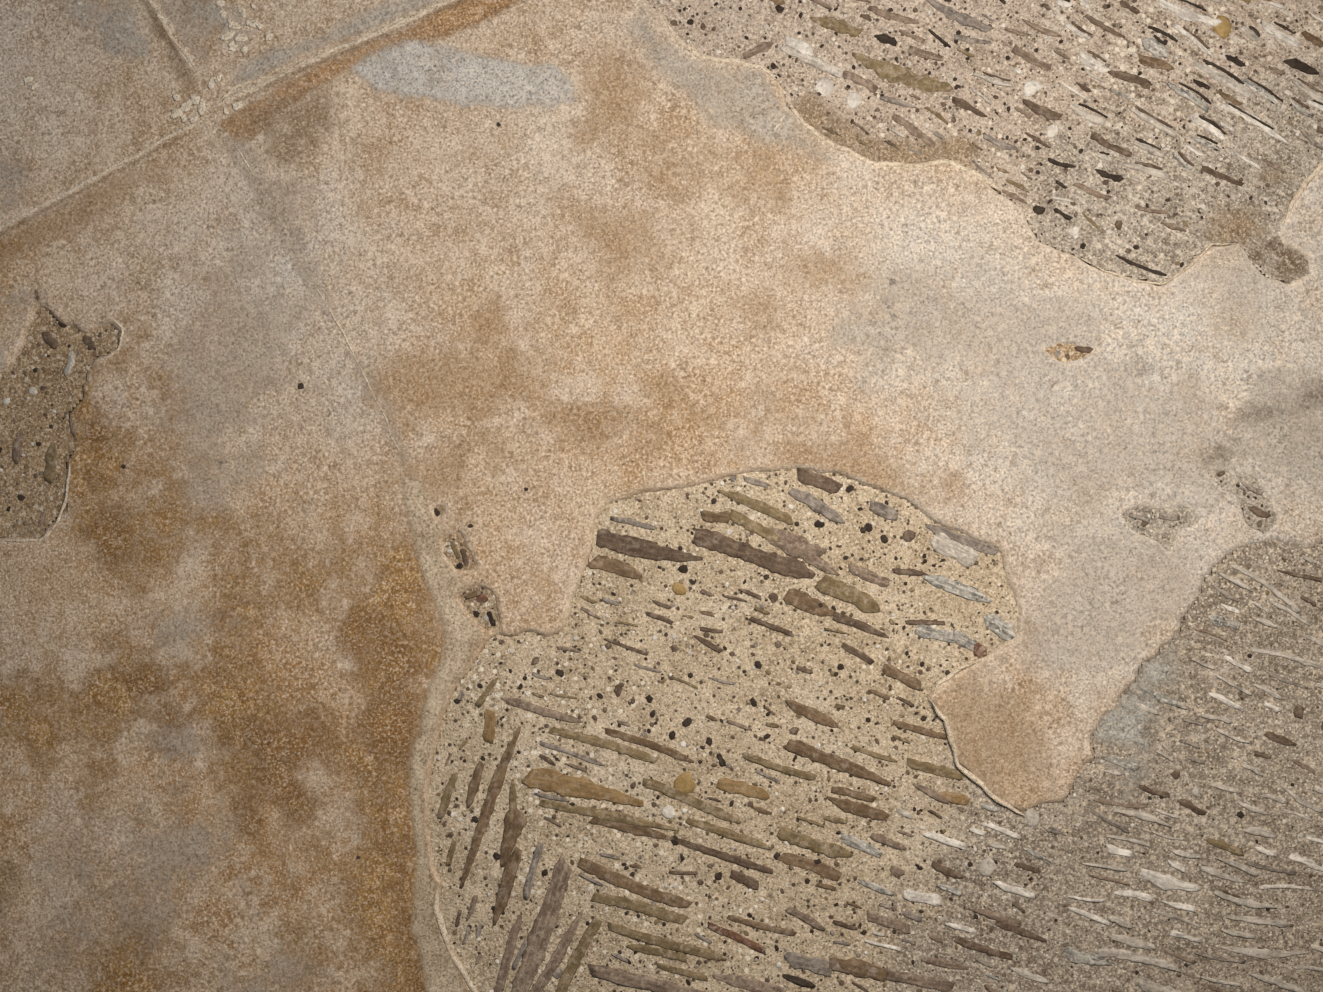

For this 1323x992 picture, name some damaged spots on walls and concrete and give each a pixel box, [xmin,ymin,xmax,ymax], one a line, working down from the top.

flaking render [0,308,124,543]
crack [0,0,455,458]
flaking render [645,0,1323,286]
flaking render [404,468,1323,992]